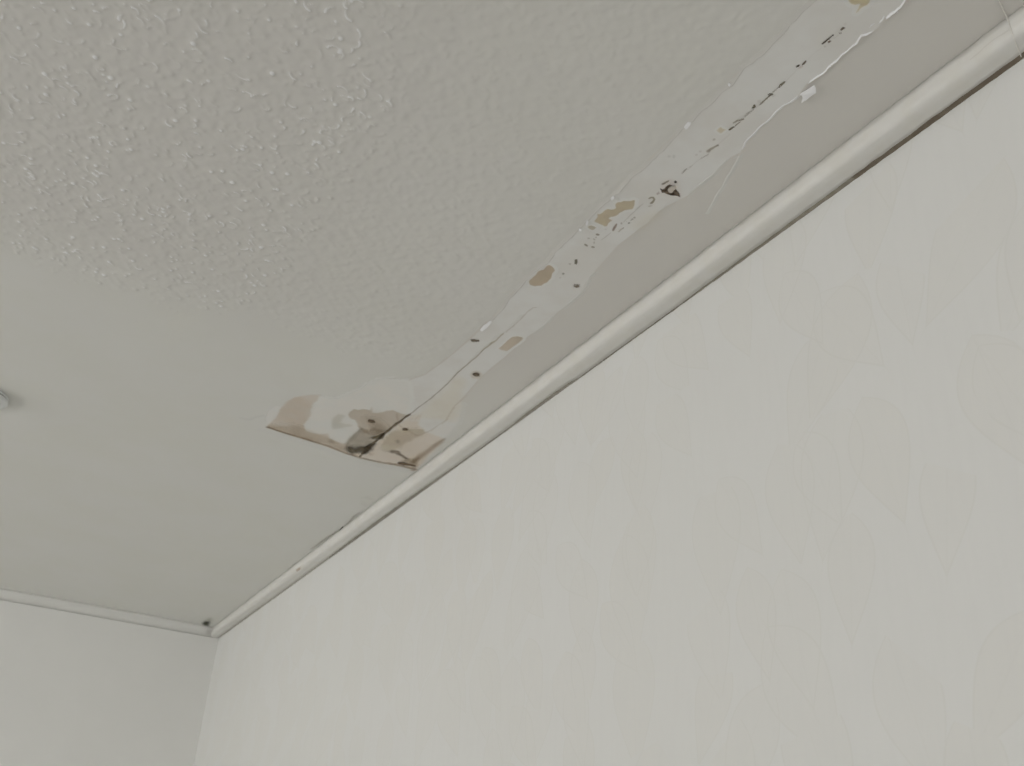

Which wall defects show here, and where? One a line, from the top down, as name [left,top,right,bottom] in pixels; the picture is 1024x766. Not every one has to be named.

leakage [260,381,468,470]
peeling [299,0,910,443]
crack [219,52,1024,637]